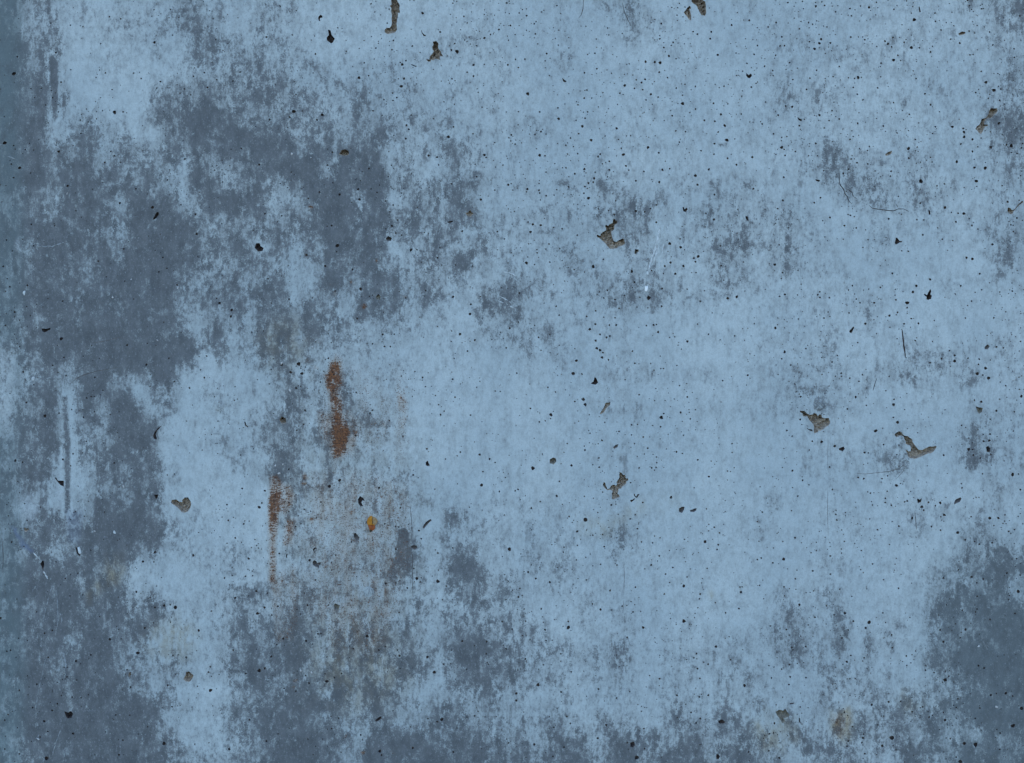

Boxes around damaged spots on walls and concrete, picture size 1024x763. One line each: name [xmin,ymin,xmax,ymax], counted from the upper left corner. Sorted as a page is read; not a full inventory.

spalling [385,0,400,34]
spalling [597,219,639,254]
water stain [473,258,535,333]
water stain [0,0,509,763]
spalling [800,411,830,433]
spalling [895,431,936,459]
spalling [603,472,639,502]
rust [263,344,423,672]
water stain [217,501,1024,763]